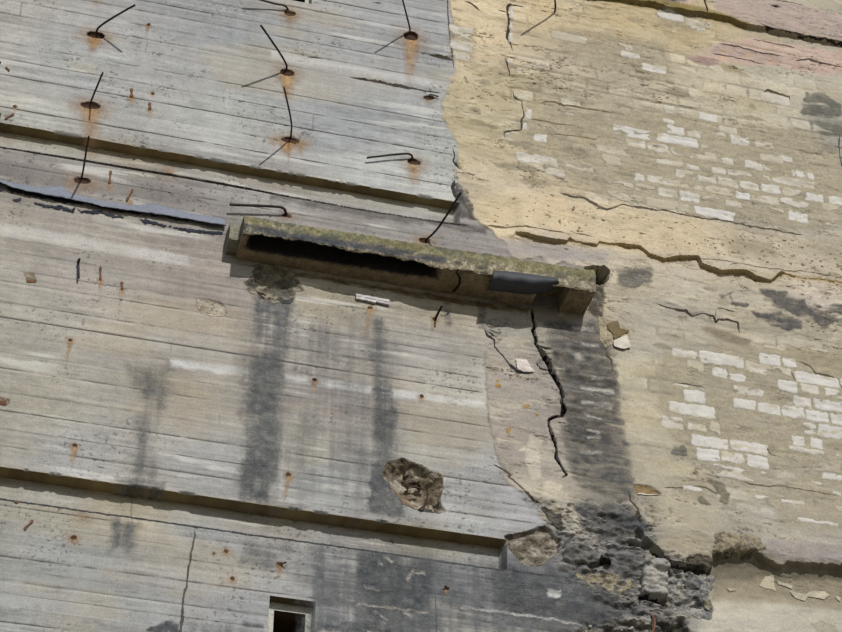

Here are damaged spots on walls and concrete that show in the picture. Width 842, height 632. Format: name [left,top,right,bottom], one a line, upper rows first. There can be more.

corrosion [81,101,100,122]
corrosion [281,136,299,151]
corrosion [404,31,418,63]
crack [500,3,618,140]
crack [659,304,740,332]
leakage [345,320,402,515]
crack [484,309,568,477]
leakage [547,285,633,496]
spalling [381,458,446,513]
leakage [307,546,639,632]
spalling [503,506,636,594]
spalling [664,531,766,620]